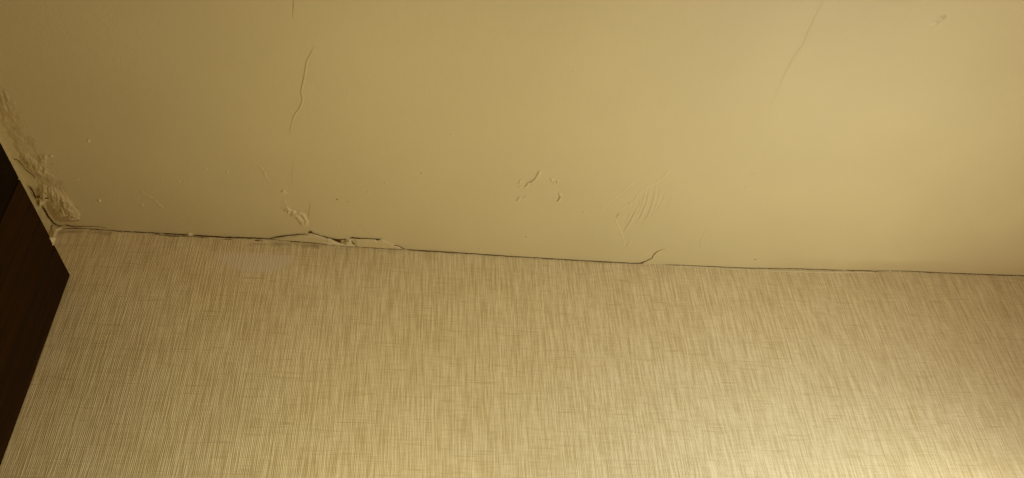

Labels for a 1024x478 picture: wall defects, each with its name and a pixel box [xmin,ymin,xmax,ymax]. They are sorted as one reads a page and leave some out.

flaking render [0,86,269,241]
crack [15,159,877,272]
crack [909,269,1024,277]